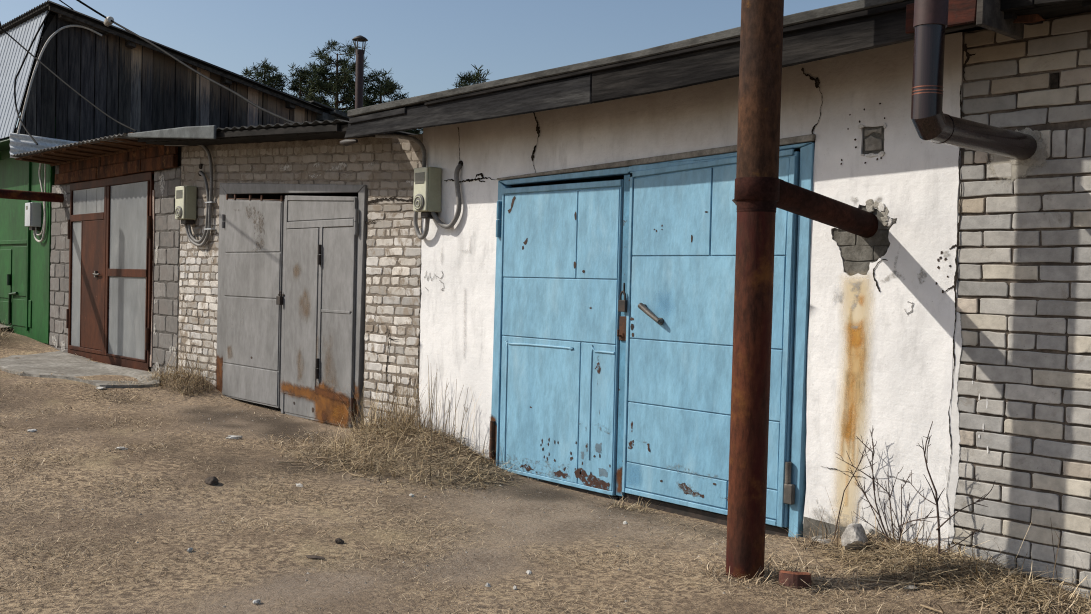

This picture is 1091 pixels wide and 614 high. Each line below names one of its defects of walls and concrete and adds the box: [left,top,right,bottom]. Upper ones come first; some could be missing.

crack [801,68,823,134]
crack [531,113,540,169]
peeling [1004,128,1046,166]
spalling [832,198,897,276]
crack [945,148,962,524]
rust [281,356,359,427]
rust [837,280,869,527]